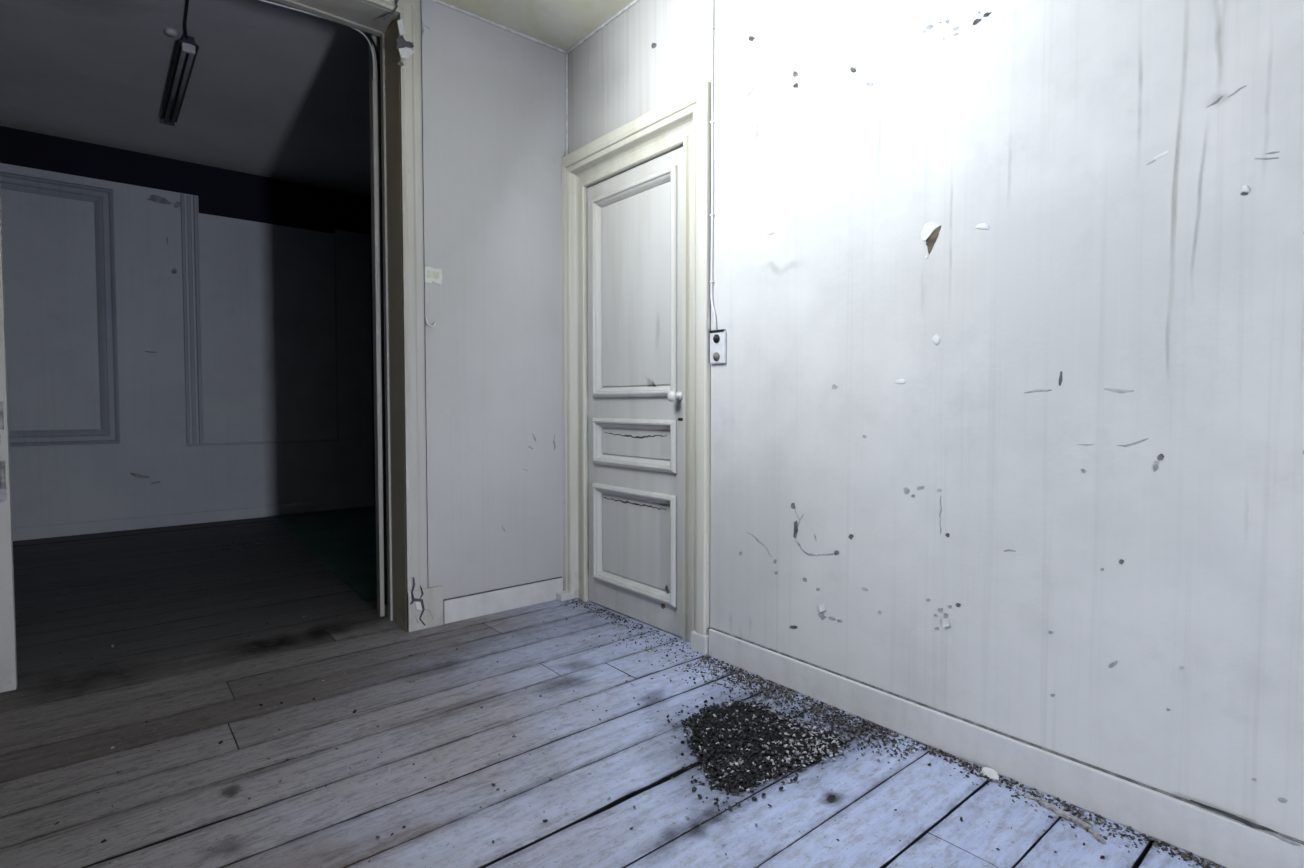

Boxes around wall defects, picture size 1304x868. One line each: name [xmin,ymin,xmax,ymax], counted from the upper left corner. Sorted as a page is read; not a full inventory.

spalling [920,222,941,258]